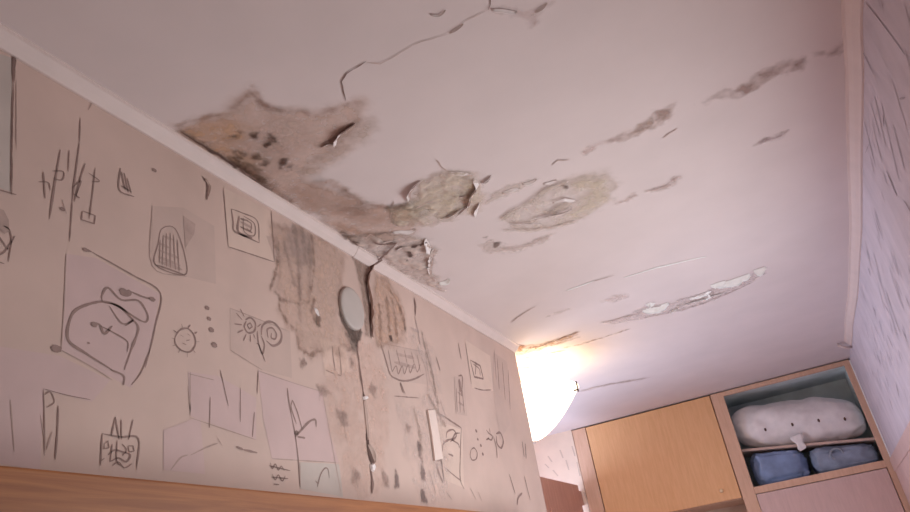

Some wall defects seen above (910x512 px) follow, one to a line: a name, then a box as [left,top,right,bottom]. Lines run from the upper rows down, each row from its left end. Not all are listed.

crack [341,0,491,101]
peeling [322,123,355,148]
flaking render [342,160,557,290]
leakage [356,260,405,342]
peeling [605,267,766,323]
crack [357,341,377,493]